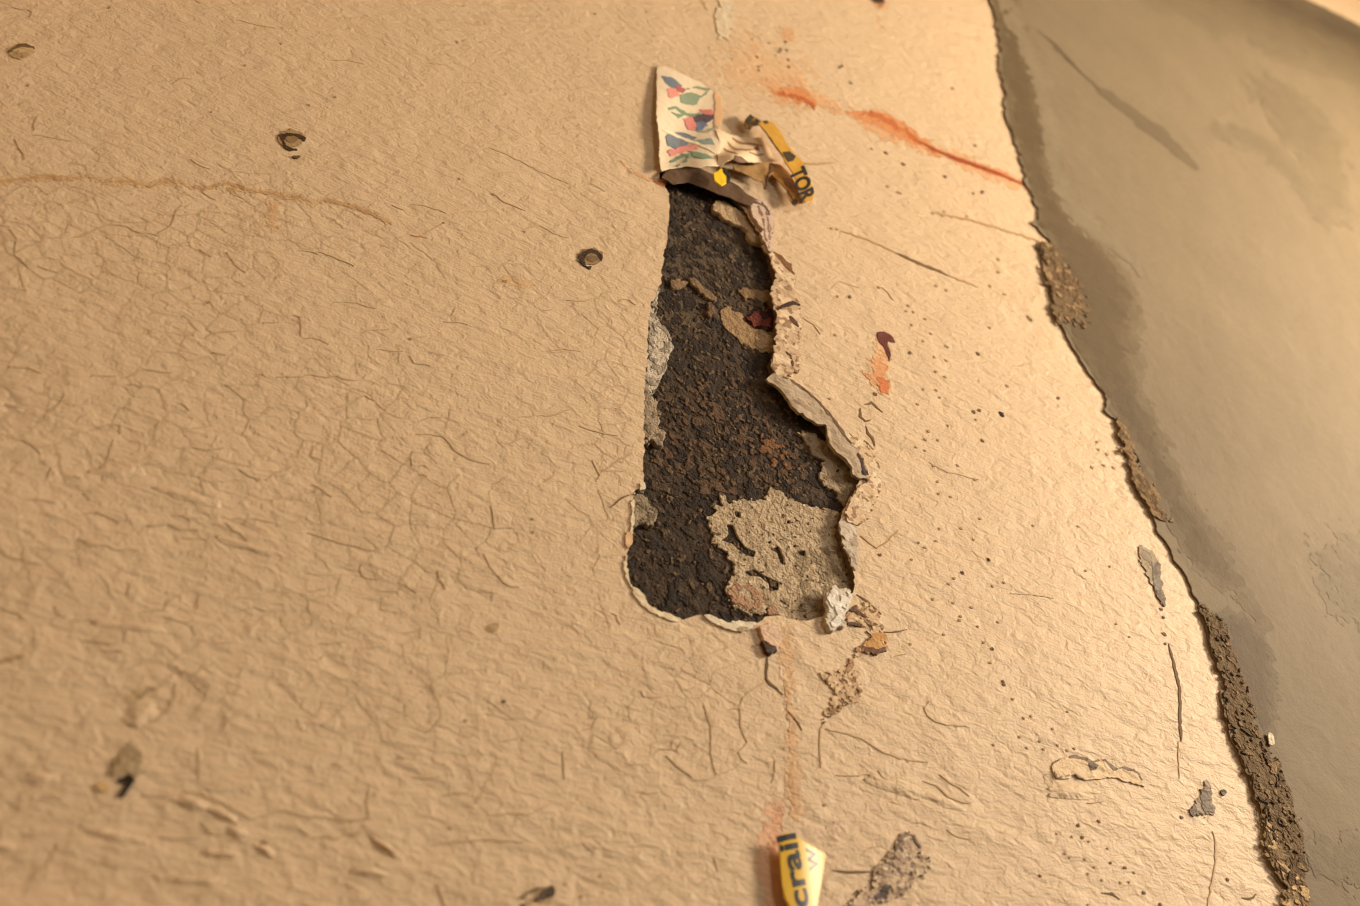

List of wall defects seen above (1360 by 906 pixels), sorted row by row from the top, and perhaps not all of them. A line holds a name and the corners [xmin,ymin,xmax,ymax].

corrosion [709,23,1027,194]
crack [934,212,1042,243]
flaking render [627,177,888,723]
crack [0,118,979,859]
crack [1010,591,1051,599]
spalling [1043,755,1145,788]
crack [833,842,888,874]
spalling [844,831,932,906]